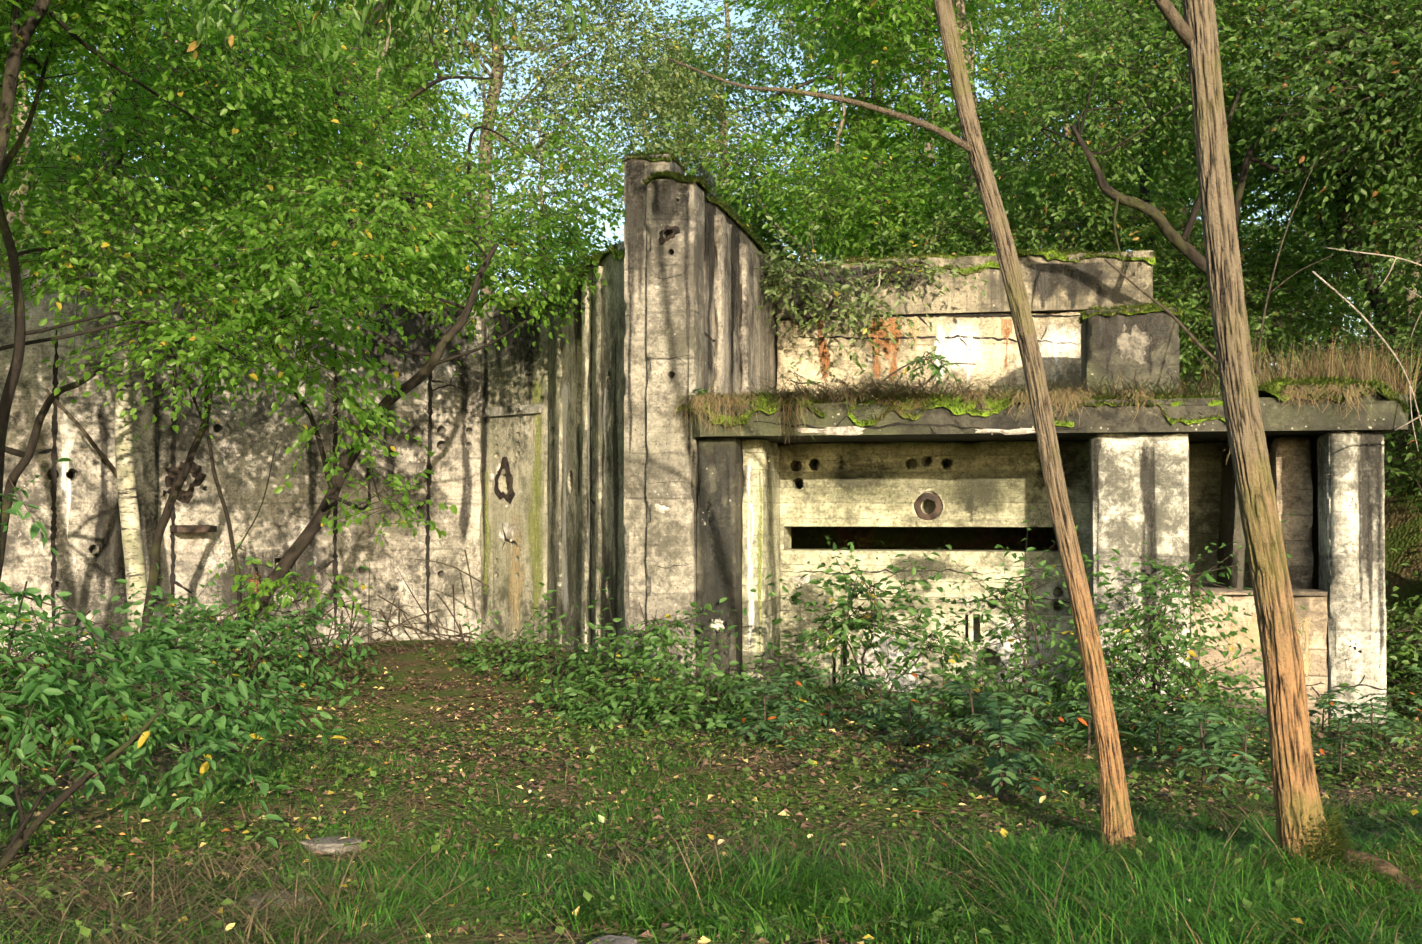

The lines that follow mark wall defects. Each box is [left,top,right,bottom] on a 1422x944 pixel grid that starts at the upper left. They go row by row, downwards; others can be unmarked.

corrosion [817,320,830,380]
corrosion [868,317,921,380]
leakage [1030,263,1168,381]
spalling [1116,324,1153,364]
leakage [561,159,762,670]